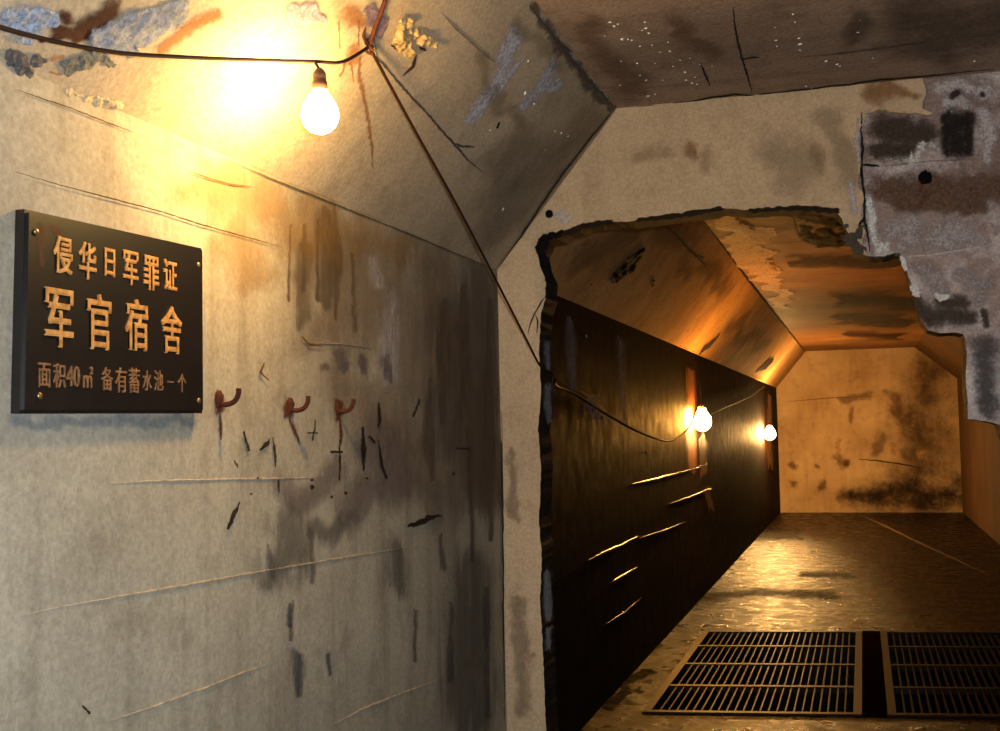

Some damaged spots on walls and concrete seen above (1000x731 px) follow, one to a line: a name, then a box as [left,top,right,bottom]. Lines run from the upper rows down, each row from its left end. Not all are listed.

peeling [0,2,61,79]
peeling [60,0,190,110]
rust [338,7,373,166]
crack [190,5,615,271]
crack [677,7,995,103]
crack [845,113,880,251]
damp [890,140,935,165]
flaking render [867,89,975,161]
damp [288,205,356,332]
rust [215,399,225,439]
rust [284,400,300,444]
damp [842,362,954,510]